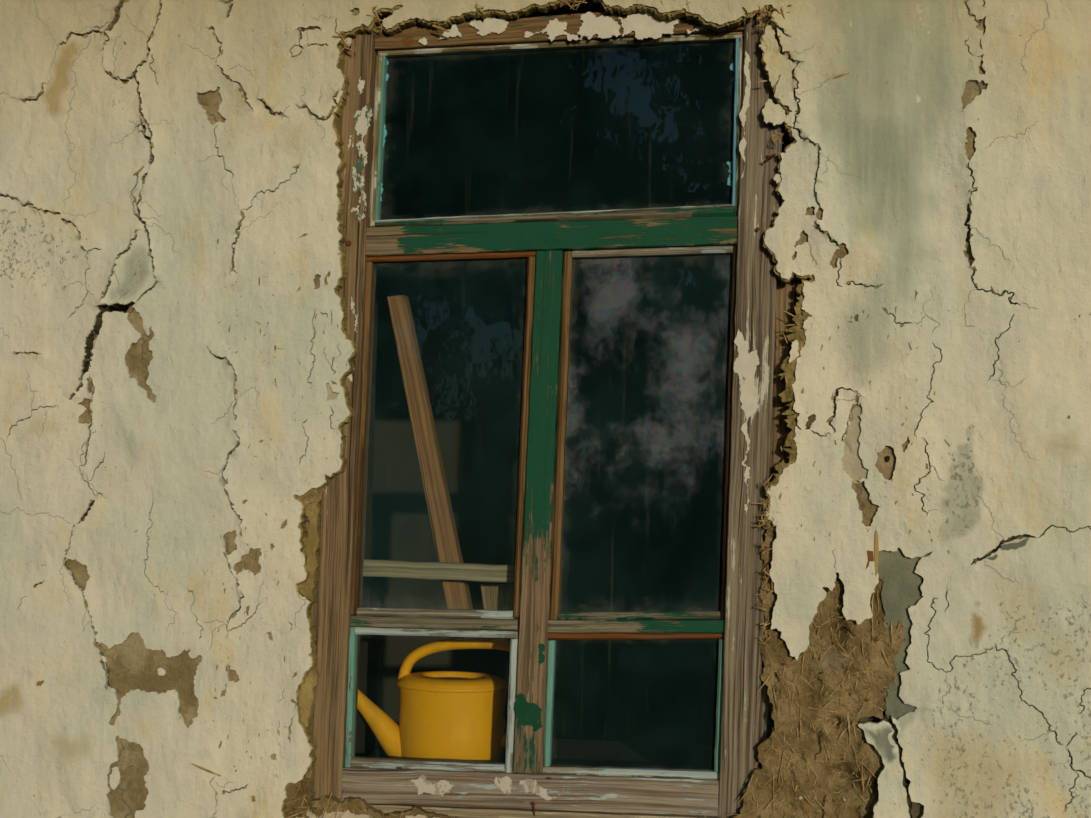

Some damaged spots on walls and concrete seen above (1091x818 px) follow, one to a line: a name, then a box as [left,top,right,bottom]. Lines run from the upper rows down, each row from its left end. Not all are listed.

spalling [197,87,226,125]
crack [187,0,339,142]
crack [772,21,864,197]
crack [0,0,177,692]
spalling [125,306,156,403]
spalling [830,243,849,269]
crack [810,121,1039,515]
spalling [831,397,913,532]
spalling [220,527,275,581]
spalling [99,632,202,818]
crack [886,715,913,818]
crack [924,592,1091,809]